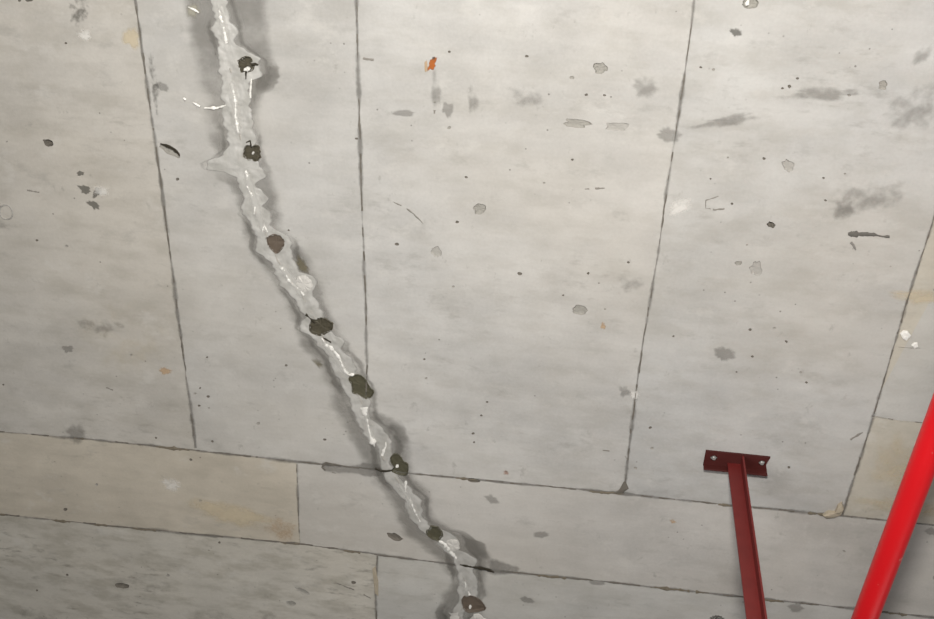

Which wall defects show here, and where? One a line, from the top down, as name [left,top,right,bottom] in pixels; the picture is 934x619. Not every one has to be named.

crack [183,0,494,619]